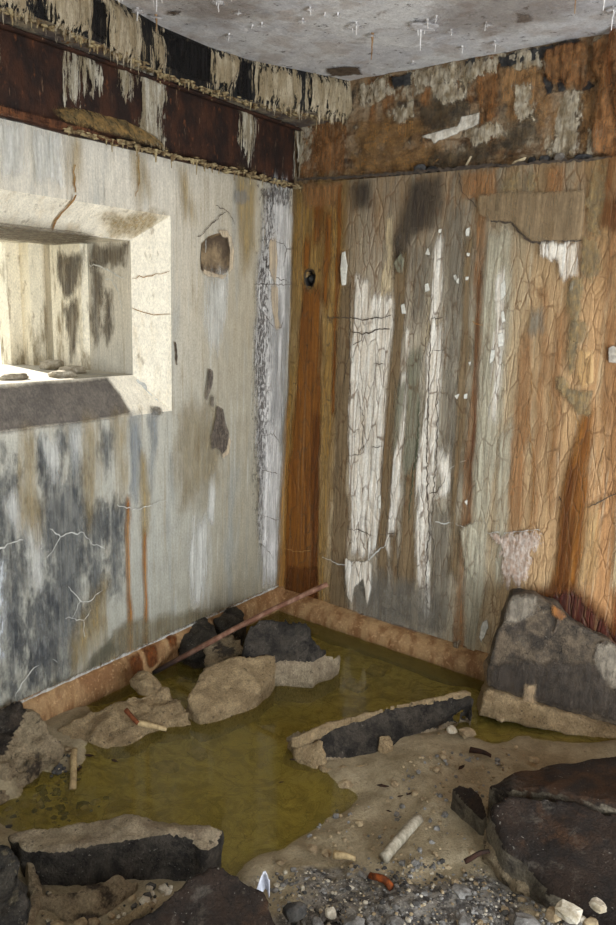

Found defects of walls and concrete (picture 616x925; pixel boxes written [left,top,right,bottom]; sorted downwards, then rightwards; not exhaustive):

peeling [423,113,480,143]
crack [52,164,77,229]
crack [297,156,612,244]
spalling [200,230,234,279]
damp [0,7,546,703]
rust [284,120,347,599]
crack [326,290,391,383]
peeling [205,369,231,458]
crack [347,274,465,603]
rust [509,336,530,530]
rust [536,411,616,646]
damp [491,644,616,721]